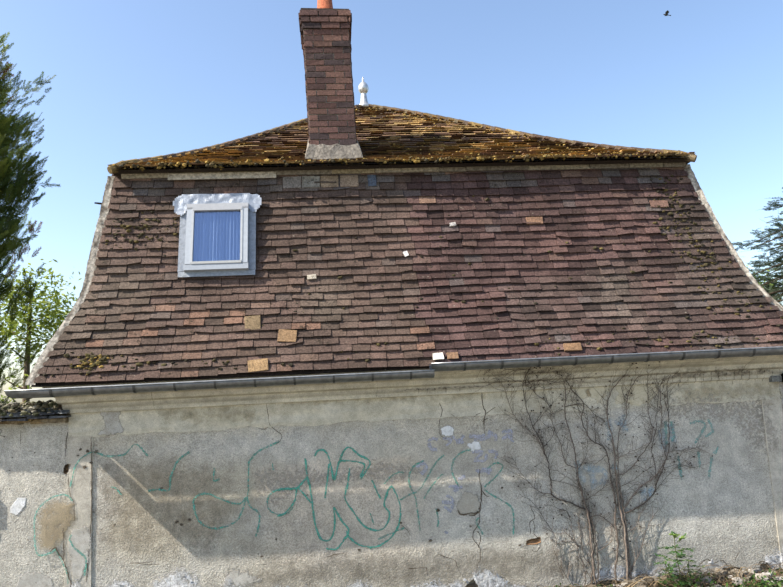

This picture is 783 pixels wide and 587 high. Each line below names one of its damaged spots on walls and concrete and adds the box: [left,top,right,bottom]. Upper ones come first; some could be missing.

crack [439,469,486,575]
water stain [153,568,200,587]
water stain [224,570,262,587]
water stain [411,570,527,587]